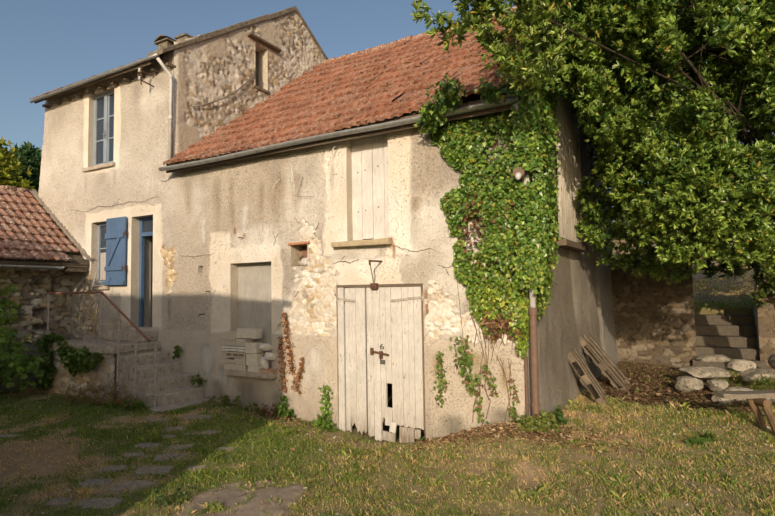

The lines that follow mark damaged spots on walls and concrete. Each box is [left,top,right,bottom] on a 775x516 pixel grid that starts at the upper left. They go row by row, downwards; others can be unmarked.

crack [70,178,170,212]
flaking render [160,245,179,296]
flaking render [277,219,340,337]
crack [392,245,453,275]
flaking render [425,279,485,344]